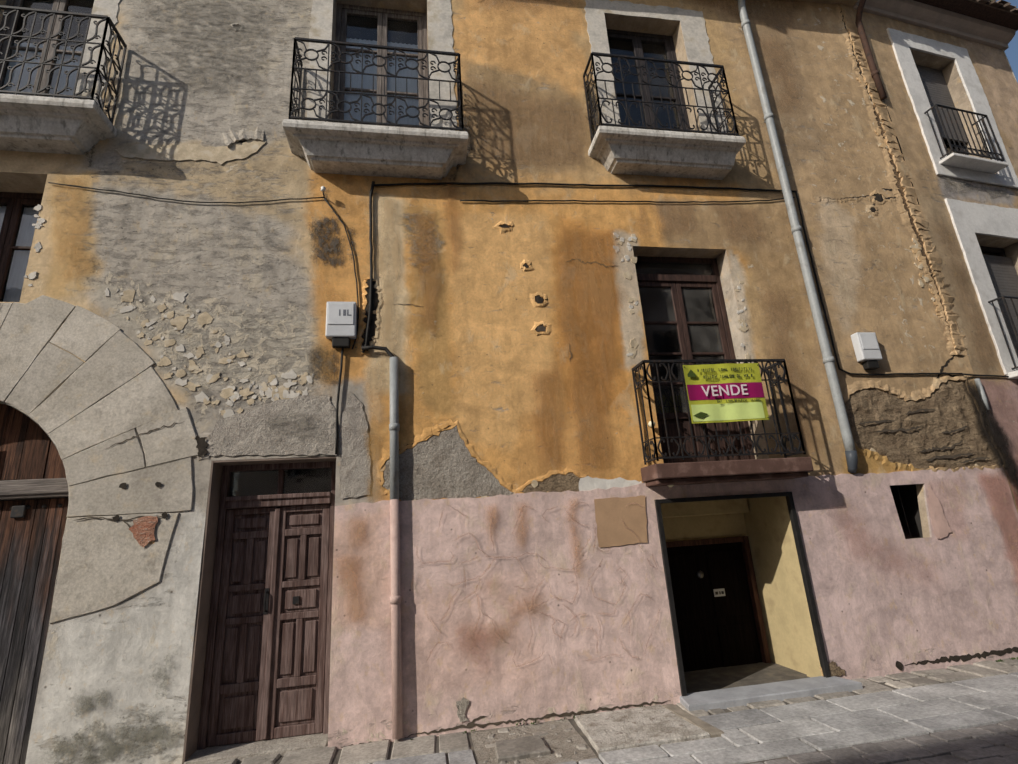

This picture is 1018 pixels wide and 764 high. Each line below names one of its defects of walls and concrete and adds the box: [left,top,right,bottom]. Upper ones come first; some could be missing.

crack [813,3,967,401]
damp [310,217,354,266]
peeling [105,288,313,418]
damp [308,346,339,383]
spalling [843,374,1005,472]
spalling [376,420,588,501]
flaking render [129,513,163,550]
crack [904,647,1018,666]
crack [341,700,671,748]